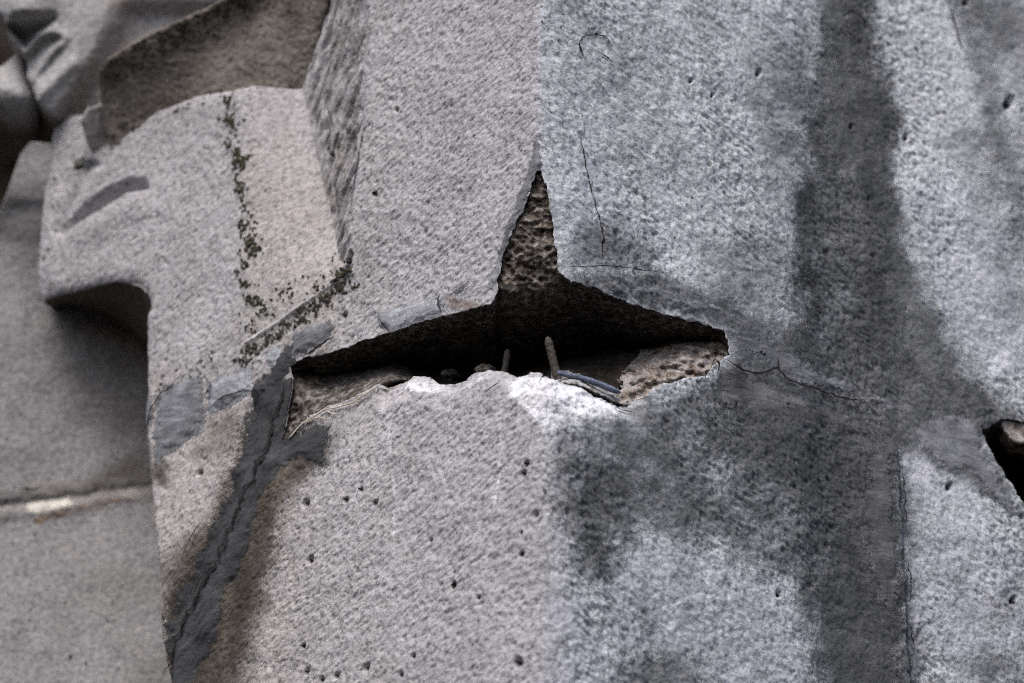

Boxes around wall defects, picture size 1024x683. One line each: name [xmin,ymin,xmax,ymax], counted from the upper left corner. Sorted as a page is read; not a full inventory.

crack [571,139,663,273]
water stain [405,381,439,392]
spalling [284,174,728,439]
water stain [509,0,1024,683]
crack [711,357,865,417]
spalling [992,420,1024,502]
water stain [162,484,236,623]
water stain [191,436,333,683]